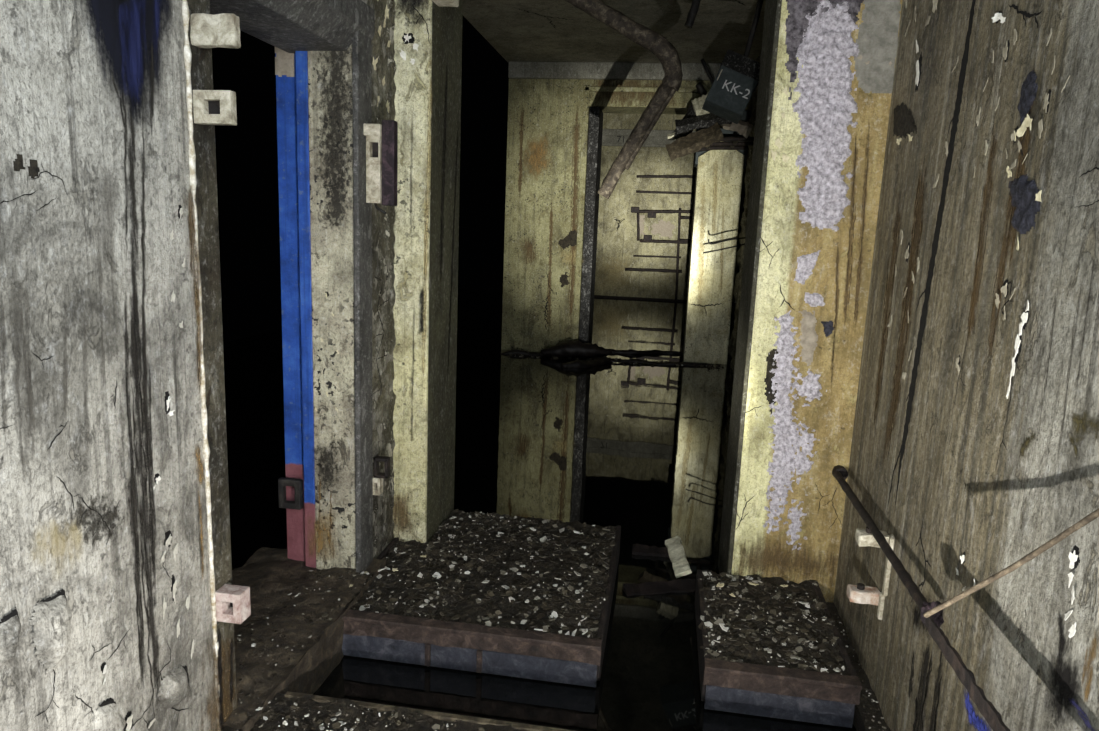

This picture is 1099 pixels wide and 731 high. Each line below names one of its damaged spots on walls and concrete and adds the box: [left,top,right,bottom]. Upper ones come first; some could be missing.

hole [13,154,40,179]
rust [571,112,579,231]
rust [594,79,662,106]
peeling [771,0,938,231]
spalling [1005,70,1070,250]
rust [568,245,576,323]
peeling [763,250,834,553]
peeling [1006,300,1030,399]